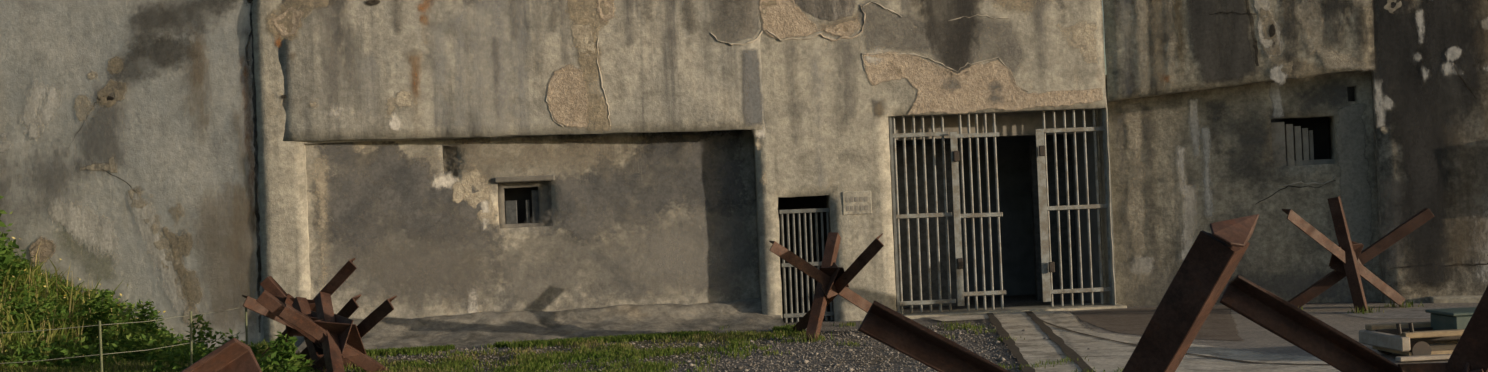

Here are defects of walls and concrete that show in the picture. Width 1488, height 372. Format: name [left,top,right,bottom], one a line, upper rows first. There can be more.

damp [110,0,237,81]
spalling [267,0,337,40]
spalling [710,0,1103,114]
damp [903,0,979,74]
damp [1103,0,1257,93]
damp [1280,0,1298,69]
peeling [1254,0,1375,84]
spalling [1352,0,1424,43]
peeling [314,0,765,278]
peeling [1118,102,1158,267]
damp [1177,79,1347,260]
damp [1324,0,1488,286]